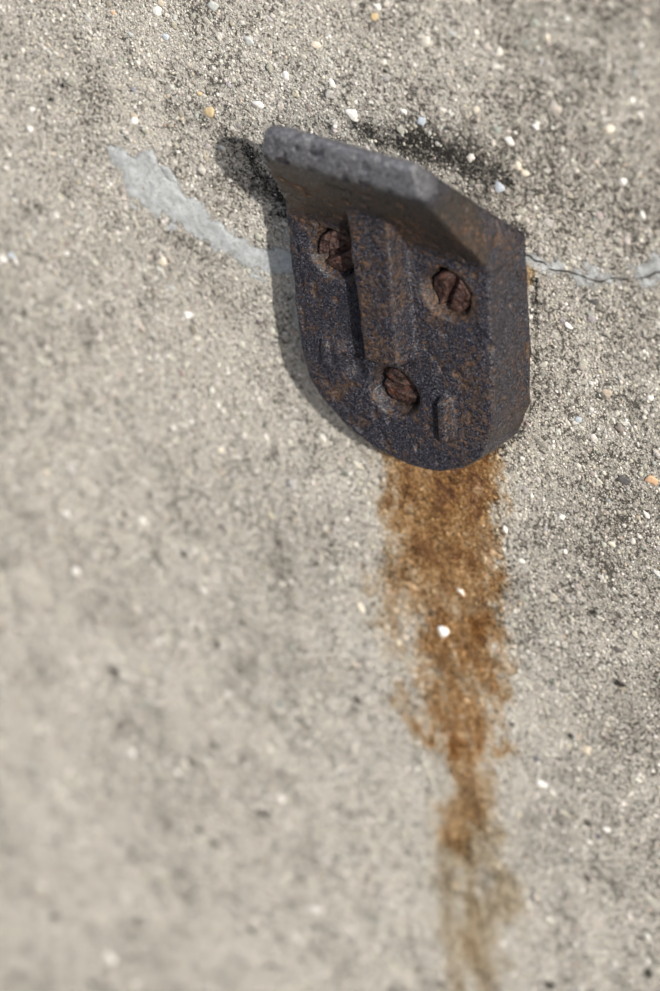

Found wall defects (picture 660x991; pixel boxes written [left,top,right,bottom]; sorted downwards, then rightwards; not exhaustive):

crack [527,255,660,283]
rust [412,452,503,661]